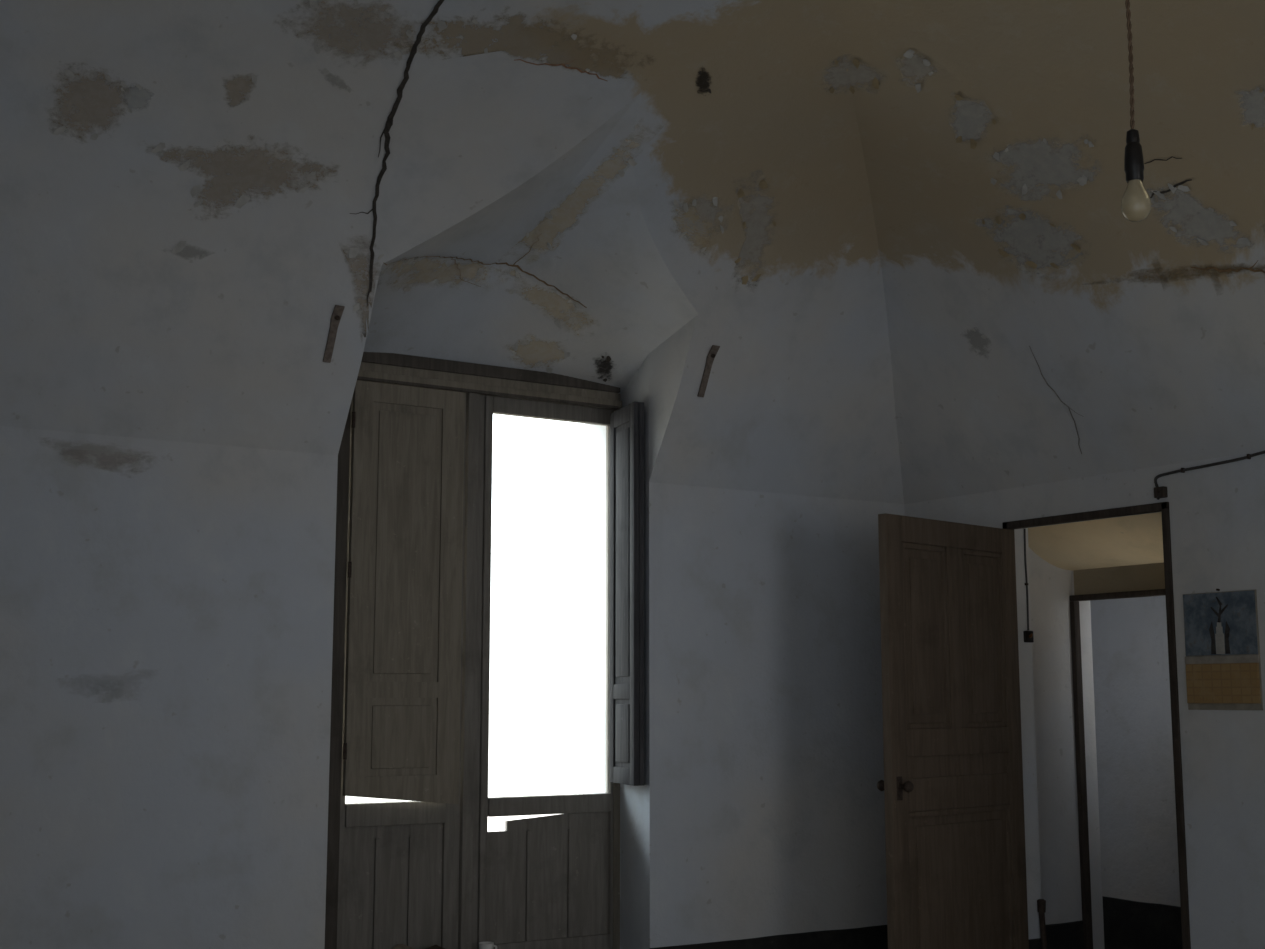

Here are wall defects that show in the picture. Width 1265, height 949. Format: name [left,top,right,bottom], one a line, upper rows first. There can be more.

spalling [696,68,711,94]
crack [350,0,587,308]
spalling [595,356,613,382]